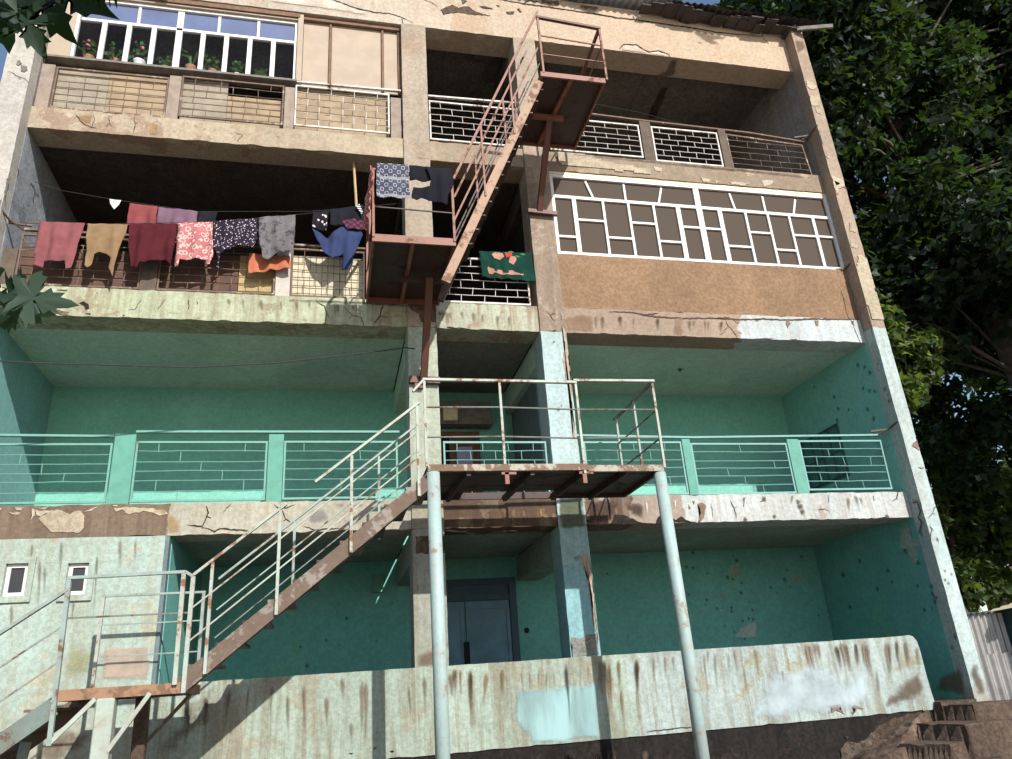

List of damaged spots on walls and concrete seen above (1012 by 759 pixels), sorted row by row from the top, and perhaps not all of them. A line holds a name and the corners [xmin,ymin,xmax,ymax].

crack [335,0,413,23]
flaking render [441,0,521,16]
peeling [39,506,97,533]
peeling [112,505,168,516]
crack [190,504,248,532]
crack [275,504,336,532]
peeling [560,498,597,527]
spalling [611,515,661,525]
peeling [673,501,706,523]
flaking render [571,554,599,657]
corrosion [449,670,488,714]
corrosion [599,661,624,713]